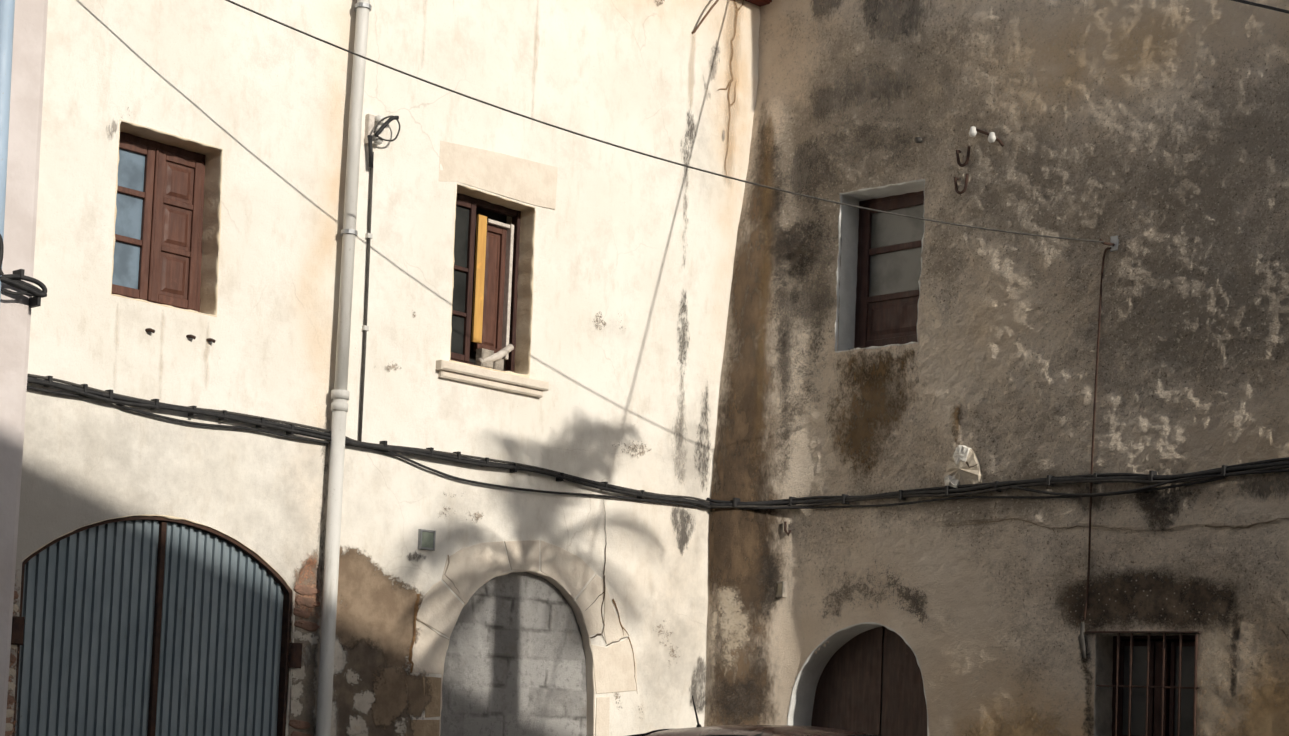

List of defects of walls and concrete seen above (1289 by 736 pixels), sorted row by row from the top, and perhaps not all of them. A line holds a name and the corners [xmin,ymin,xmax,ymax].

crack [718,0,743,176]
leakage [811,0,841,17]
leakage [672,63,925,726]
spalling [286,546,432,736]
crack [585,506,637,687]
crack [966,518,1289,543]
leakage [1057,570,1289,736]